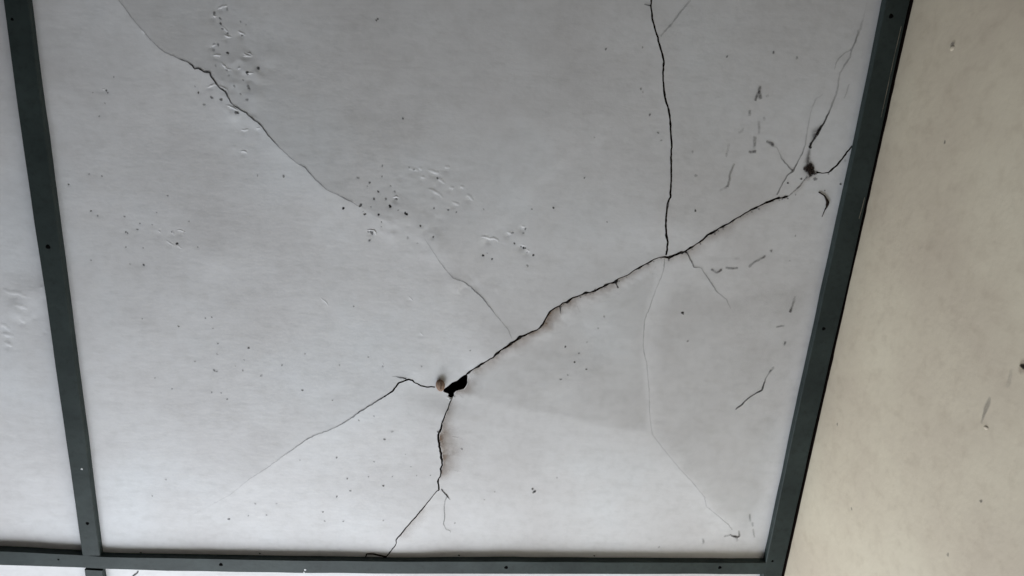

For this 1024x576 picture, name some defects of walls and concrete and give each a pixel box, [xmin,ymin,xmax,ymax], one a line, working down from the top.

crack [178,58,277,145]
crack [341,0,852,558]
crack [782,0,913,576]